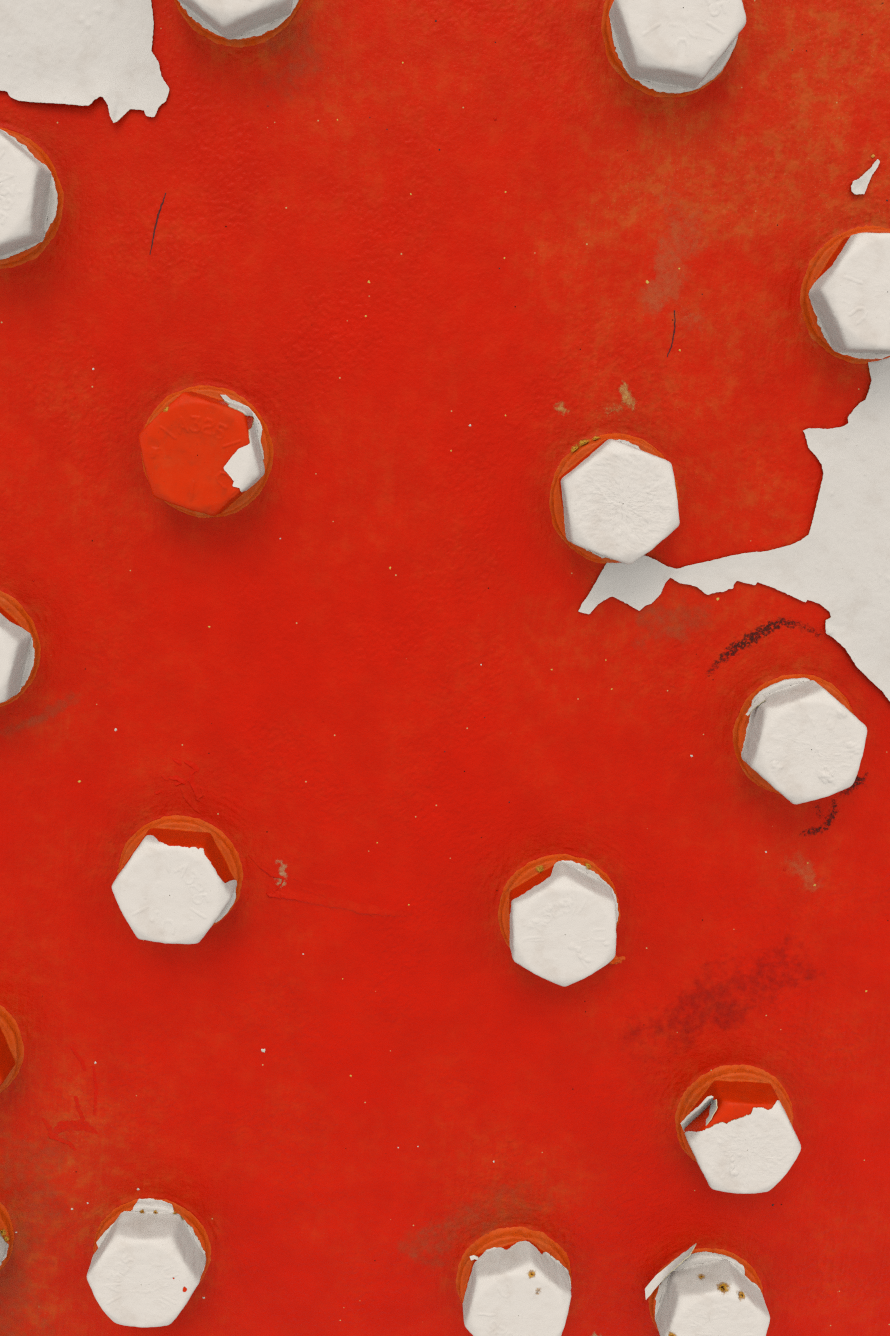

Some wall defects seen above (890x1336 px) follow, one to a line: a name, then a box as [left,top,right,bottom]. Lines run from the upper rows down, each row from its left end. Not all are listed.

peeling [0,0,169,123]
peeling [579,357,890,701]
peeling [746,694,766,716]
peeling [680,1095,718,1132]
peeling [645,1243,697,1299]